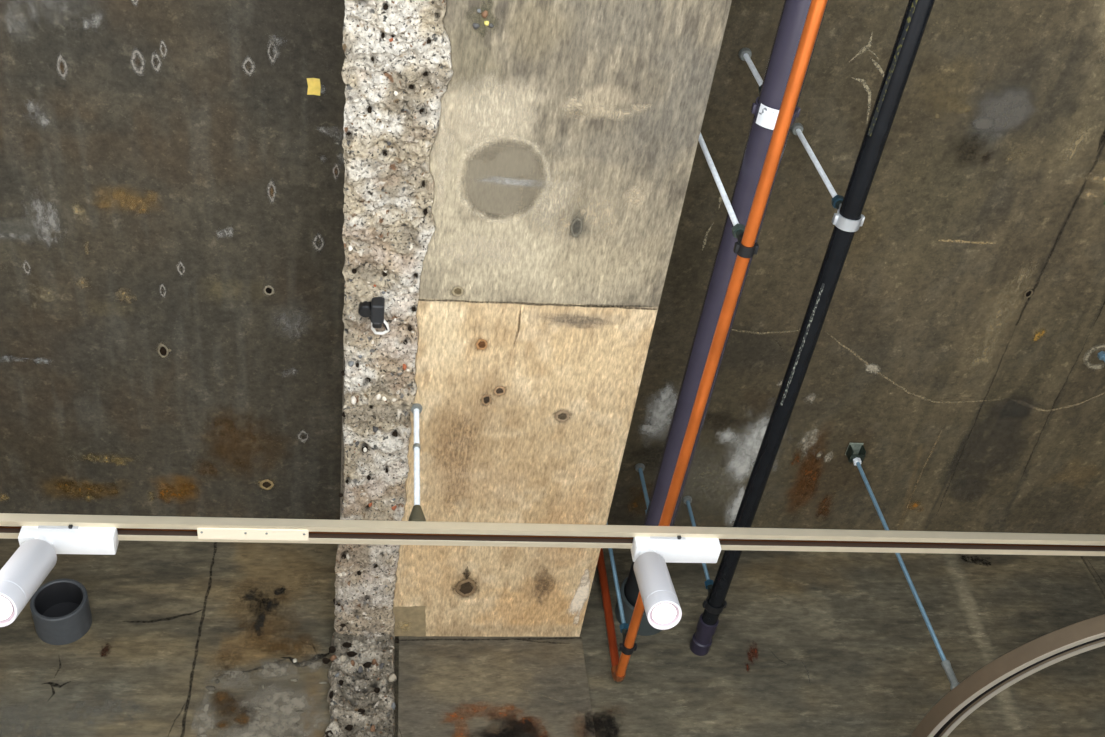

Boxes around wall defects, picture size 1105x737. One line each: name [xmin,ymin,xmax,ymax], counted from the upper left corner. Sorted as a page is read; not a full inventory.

leakage [642,388,677,433]
leakage [683,415,770,521]
crack [122,542,330,737]
rust [447,705,547,737]